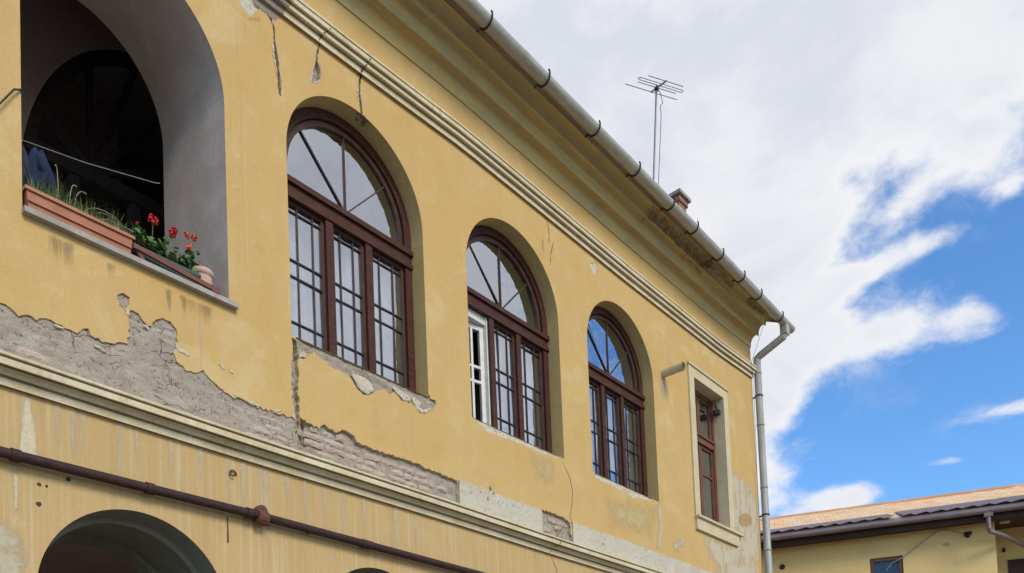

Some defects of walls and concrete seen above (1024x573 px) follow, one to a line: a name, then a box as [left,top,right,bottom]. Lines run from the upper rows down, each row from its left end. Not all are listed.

crack [266,13,282,96]
crack [308,28,331,88]
crack [355,54,372,126]
peeling [0,293,458,502]
spalling [542,510,574,542]
crack [548,462,573,572]